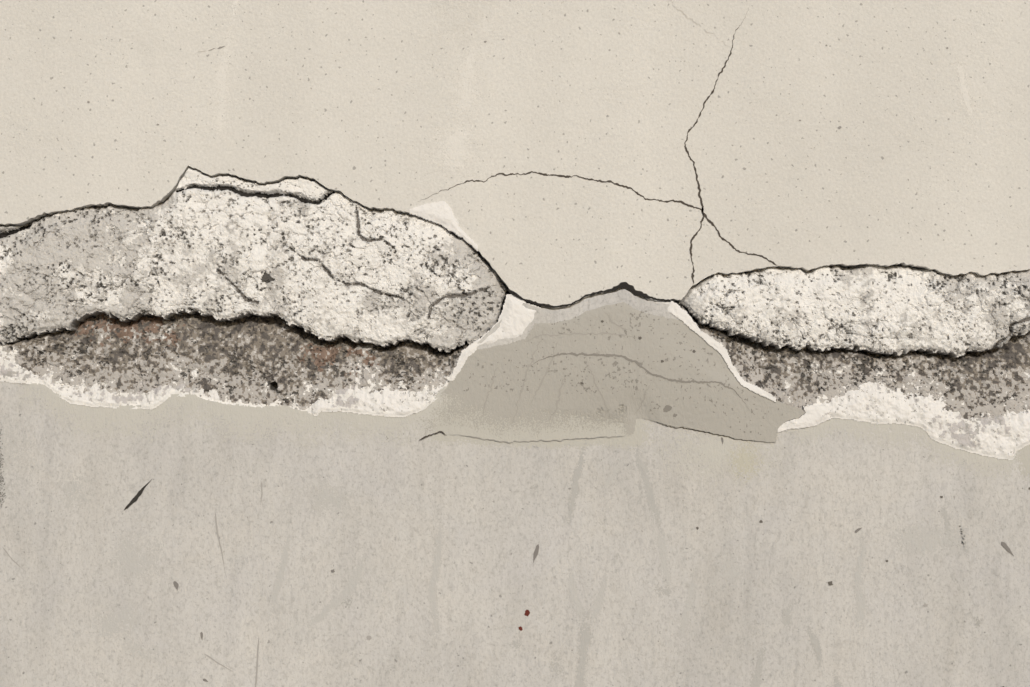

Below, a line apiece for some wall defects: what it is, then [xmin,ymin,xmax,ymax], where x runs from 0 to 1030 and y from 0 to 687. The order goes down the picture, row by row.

crack [420,0,776,319]
spalling [0,167,541,417]
crack [289,247,404,301]
crack [528,332,746,404]
spalling [644,264,1030,460]
leakage [0,382,1030,589]